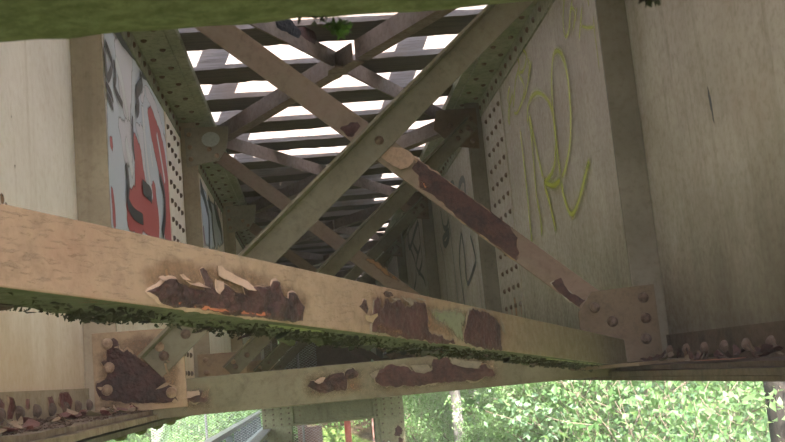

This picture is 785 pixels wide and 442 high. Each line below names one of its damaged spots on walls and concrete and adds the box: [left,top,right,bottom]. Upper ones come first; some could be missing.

rust [0,292,600,372]
peeling [307,291,506,395]
peeling [47,391,73,412]